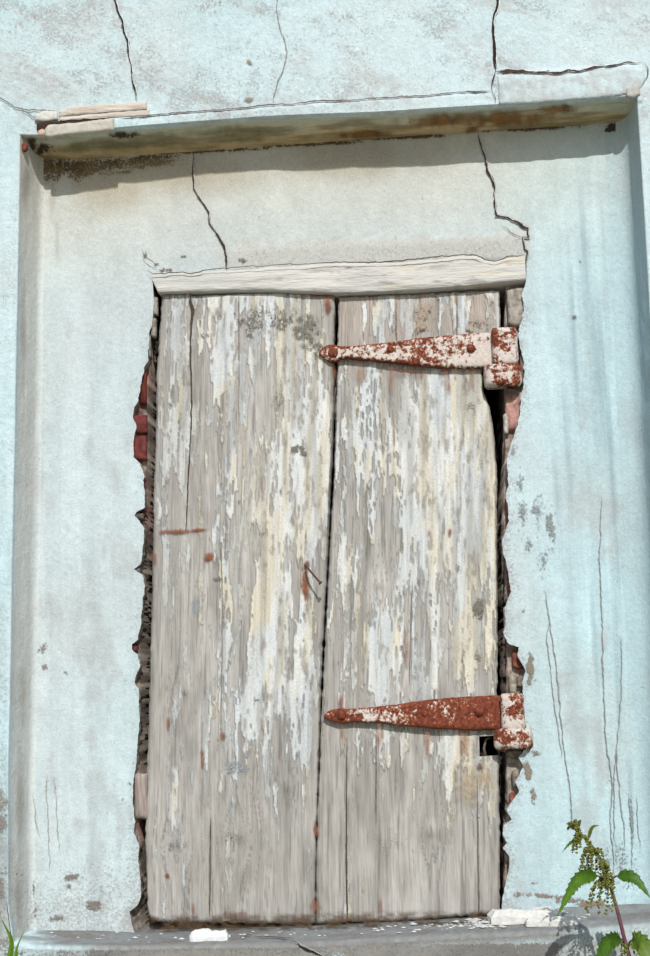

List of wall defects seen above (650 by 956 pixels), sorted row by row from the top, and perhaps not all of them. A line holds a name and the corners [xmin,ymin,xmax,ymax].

crack [0,98,55,117]
water stain [51,106,581,178]
crack [114,0,649,117]
crack [142,134,530,274]
peeling [133,287,540,856]
crack [243,935,324,956]